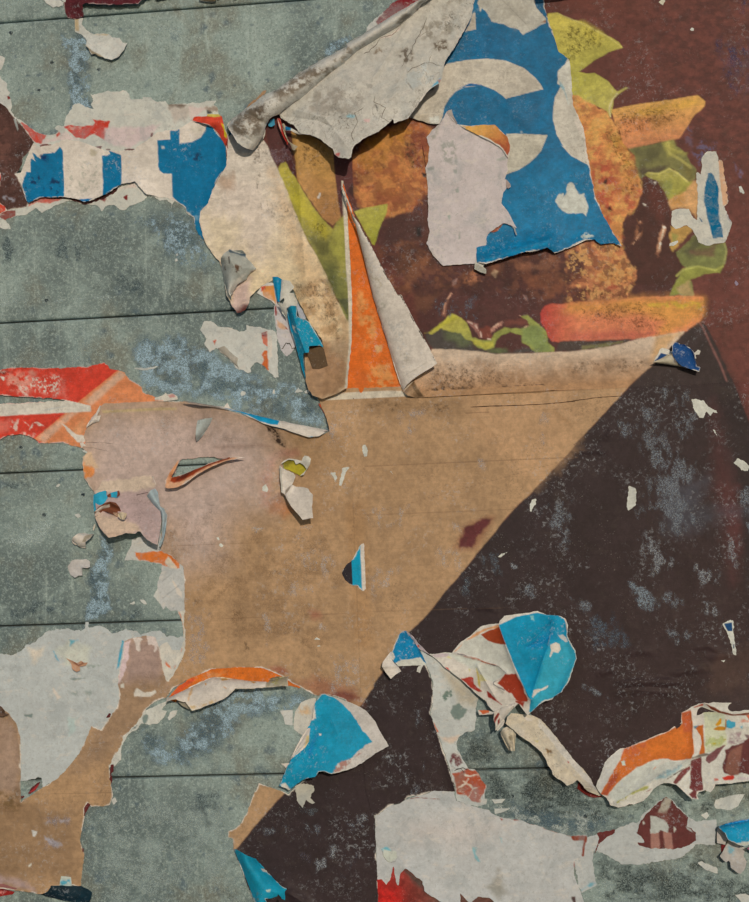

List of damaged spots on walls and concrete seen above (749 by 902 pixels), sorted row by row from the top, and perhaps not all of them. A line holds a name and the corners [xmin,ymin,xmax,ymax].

peeling [227,0,475,159]
peeling [342,186,437,398]
peeling [186,401,328,437]
peeling [166,676,289,720]
peeling [279,694,389,790]
peeling [430,611,749,819]
peeling [698,861,718,873]
peeling [719,819,749,850]